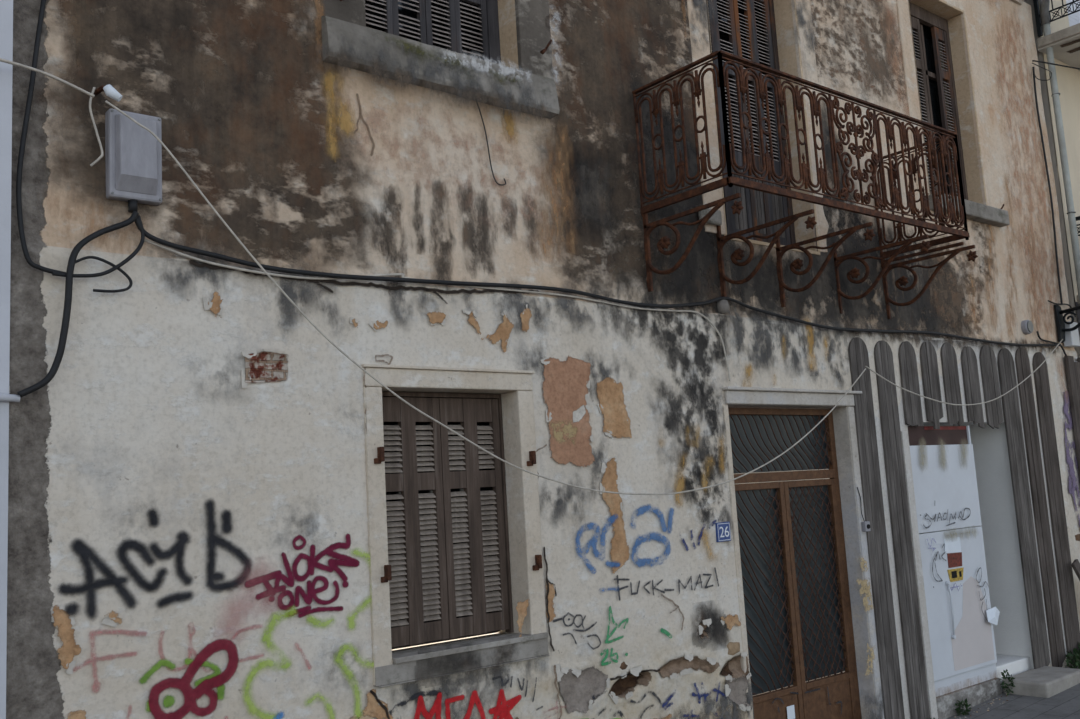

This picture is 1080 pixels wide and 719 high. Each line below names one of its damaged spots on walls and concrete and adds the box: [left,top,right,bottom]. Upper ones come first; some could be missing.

damp [46,0,405,326]
damp [429,0,1058,353]
damp [414,180,451,287]
peeling [350,317,388,332]
peeling [427,312,446,326]
peeling [462,302,532,352]
spalling [241,349,288,388]
damp [361,364,535,374]
peeling [541,355,632,573]
peeling [52,604,81,674]
spalling [556,614,752,719]
peeling [350,689,393,719]